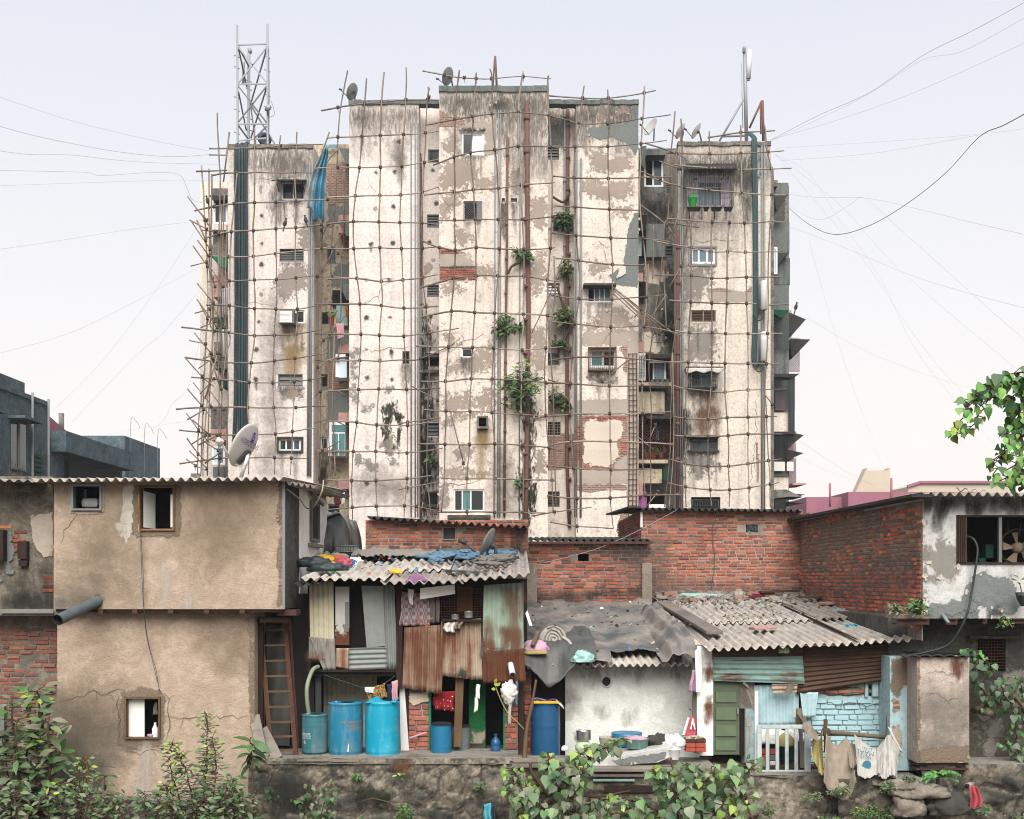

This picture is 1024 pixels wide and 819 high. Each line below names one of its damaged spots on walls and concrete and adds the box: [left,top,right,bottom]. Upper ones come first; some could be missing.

spalling [424,108,548,298]
peeling [578,134,640,231]
peeling [586,258,618,281]
leakage [381,417,402,454]
flaking render [531,414,628,493]
spalling [30,512,54,558]
peeling [115,485,139,543]
peeling [922,539,960,598]
rust [485,588,522,652]
crack [65,689,243,772]